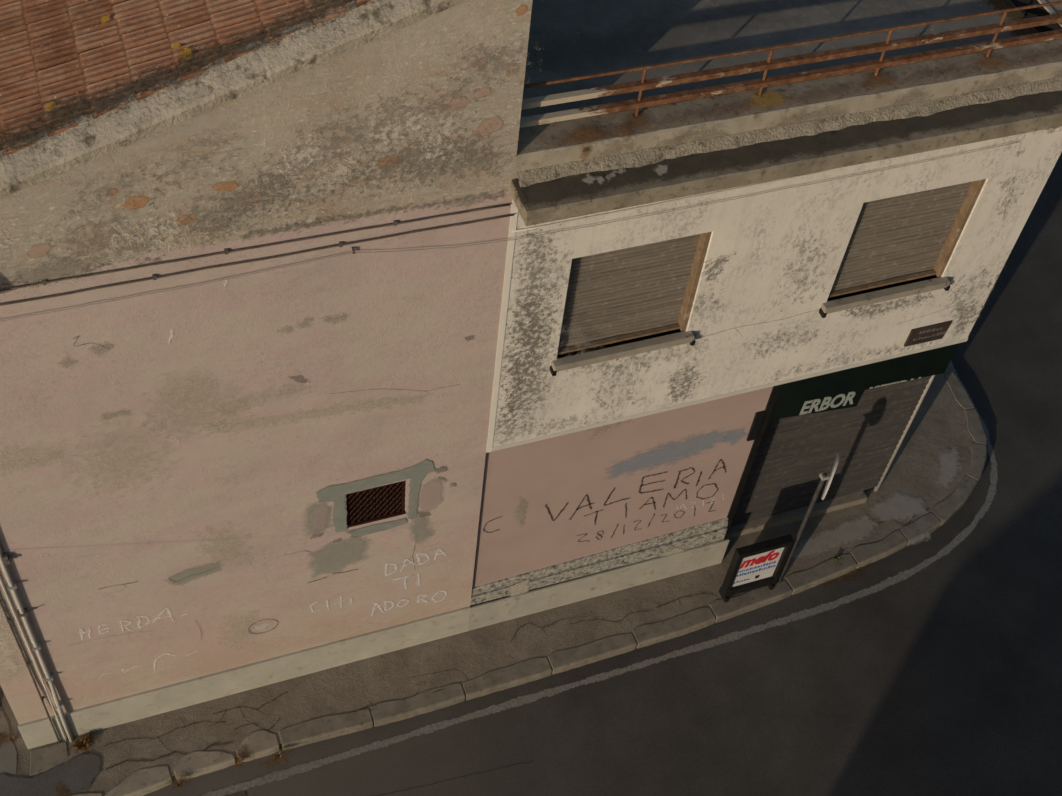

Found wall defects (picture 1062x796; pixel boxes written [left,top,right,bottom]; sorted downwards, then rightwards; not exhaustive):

peeling [310,459,456,543]
crack [104,692,287,770]